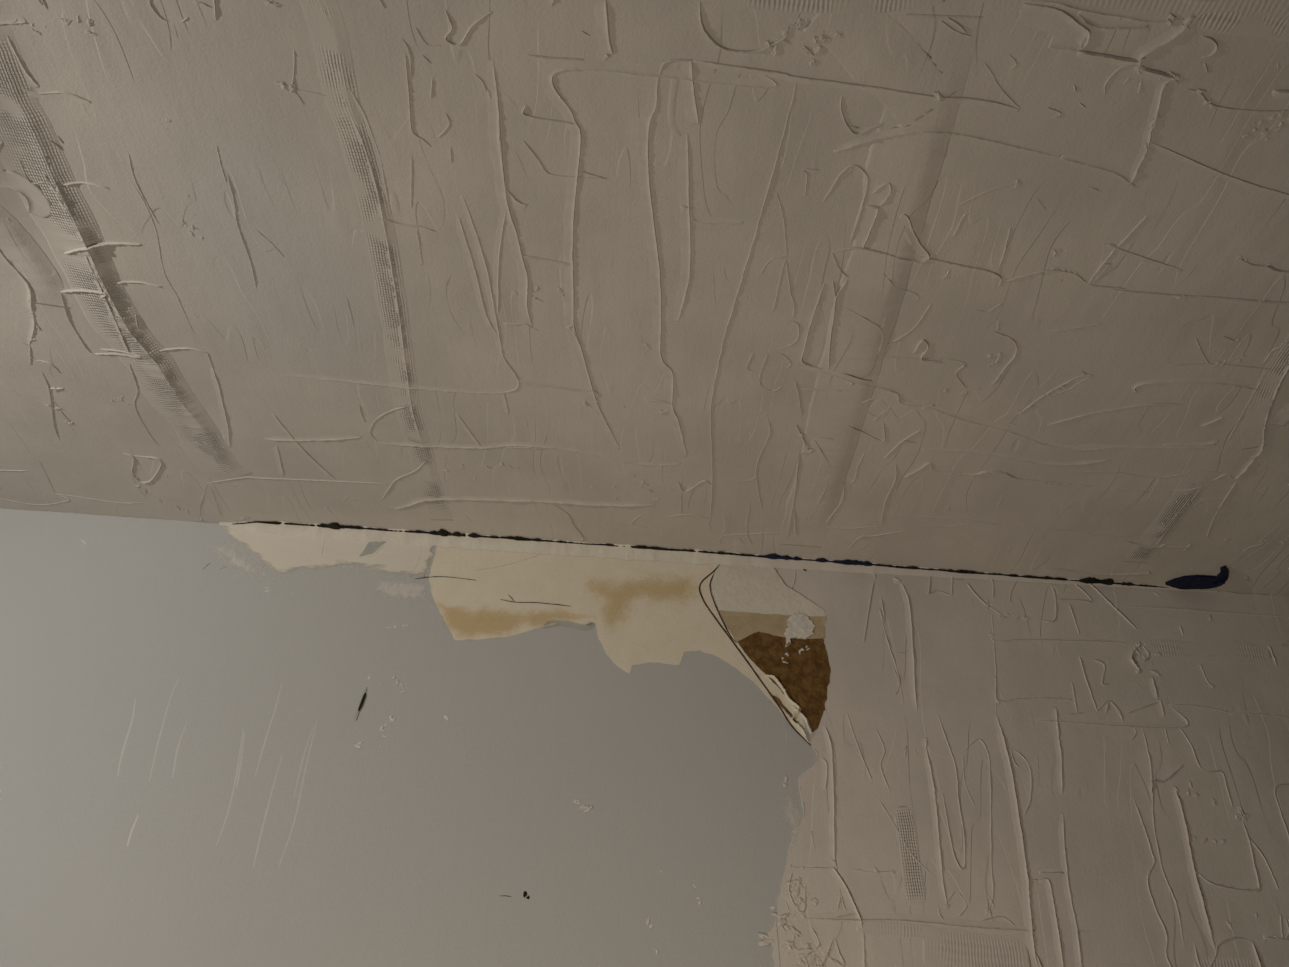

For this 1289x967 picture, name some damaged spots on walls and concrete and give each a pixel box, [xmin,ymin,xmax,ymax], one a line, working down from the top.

peeling [226,526,810,742]